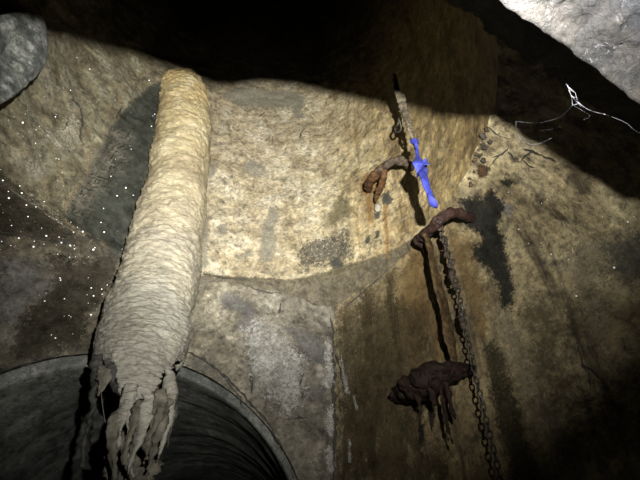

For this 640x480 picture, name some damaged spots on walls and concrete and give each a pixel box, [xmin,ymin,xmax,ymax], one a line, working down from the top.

leakage [201,196,454,480]
corrosion [360,169,388,223]
crack [484,126,556,174]
leakage [458,189,640,480]